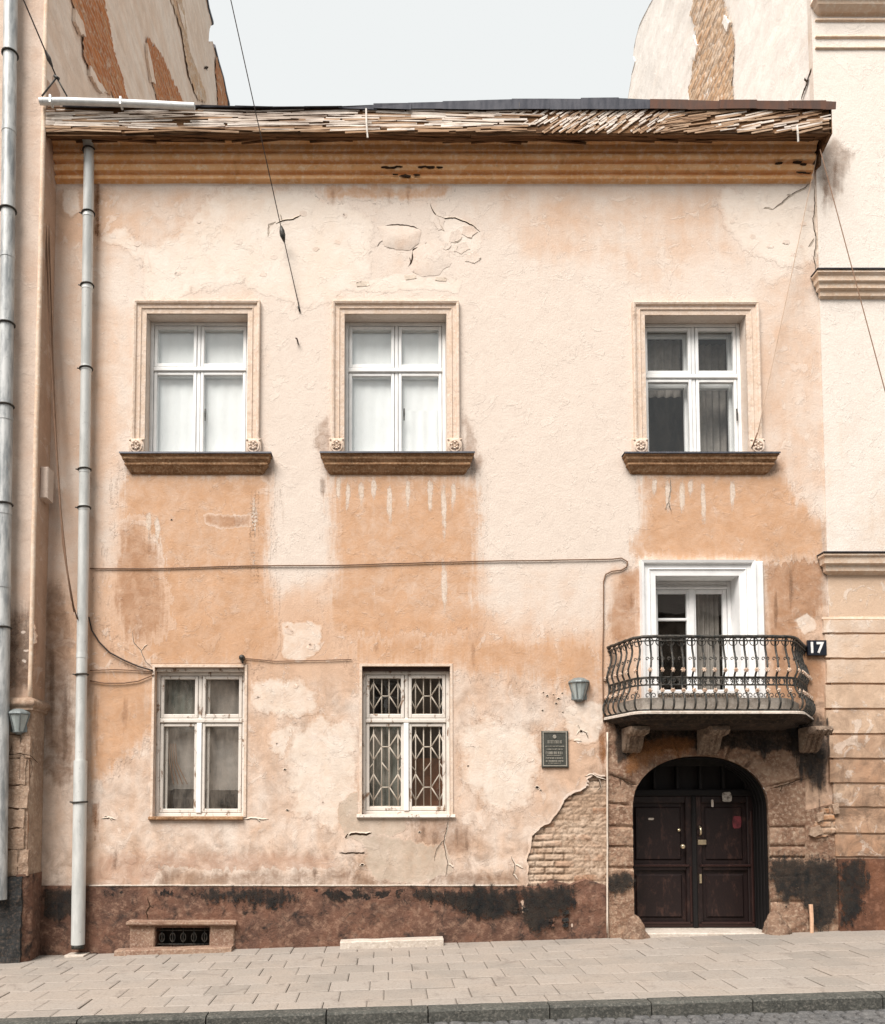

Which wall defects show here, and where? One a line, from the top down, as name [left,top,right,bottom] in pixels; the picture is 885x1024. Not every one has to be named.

peeling [98,184,463,311]
crack [268,214,301,236]
flaking render [429,210,484,263]
crack [764,184,818,270]
leakage [10,449,288,793]
leakage [312,409,830,807]
peeling [250,620,358,834]
leakage [44,889,72,921]
leakage [86,813,531,923]
crack [434,818,454,873]
spalling [525,773,609,886]
leakage [768,853,871,932]